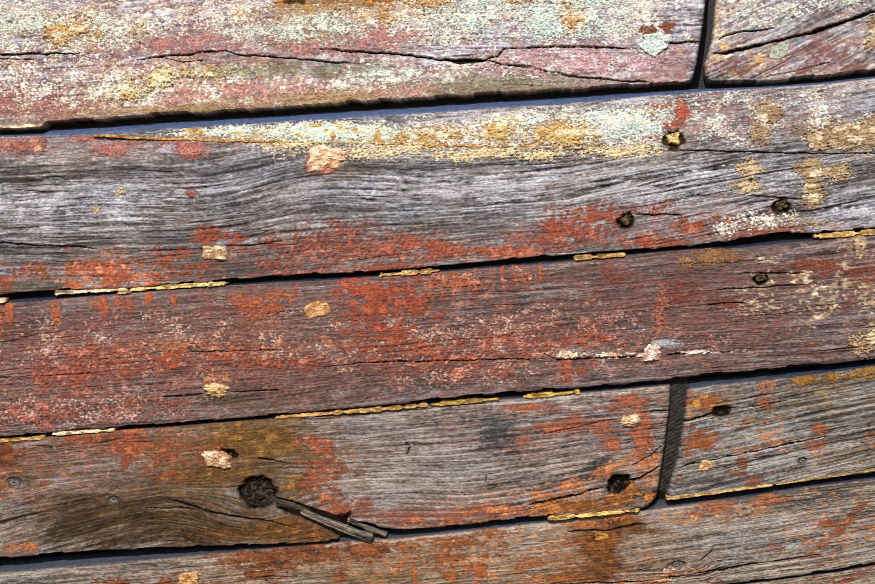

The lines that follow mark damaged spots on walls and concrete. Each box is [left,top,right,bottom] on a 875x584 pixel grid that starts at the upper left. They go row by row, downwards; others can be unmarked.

crack [669,10,875,55]
crack [0,52,80,60]
crack [130,46,649,83]
peeling [772,255,875,290]
peeling [0,199,807,482]
peeling [208,391,661,584]
peeling [1,542,38,553]
peeling [801,503,870,558]